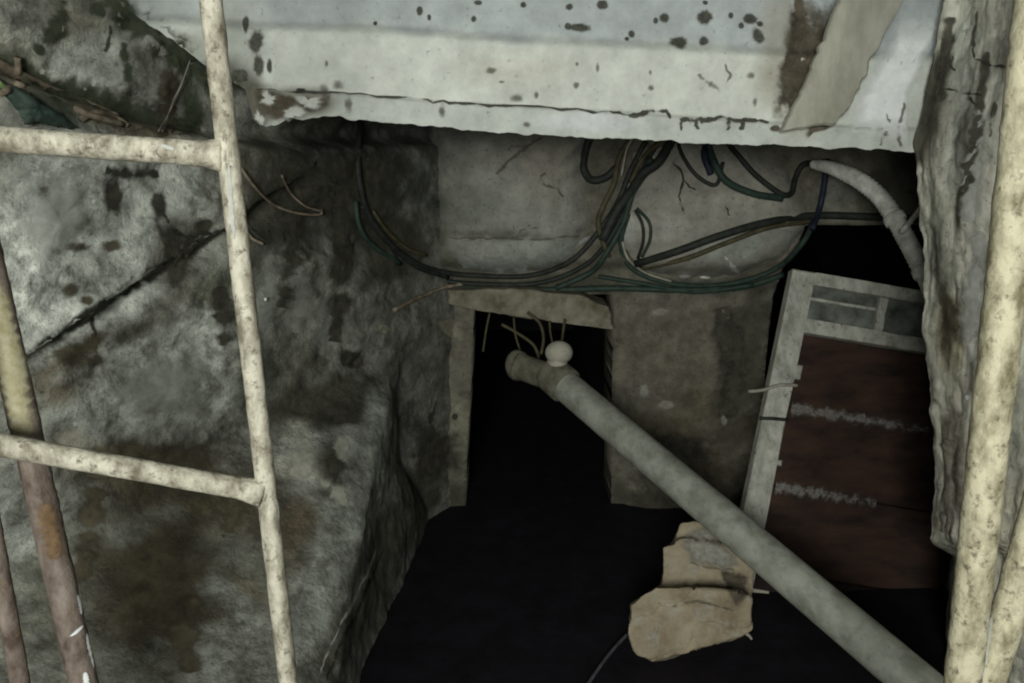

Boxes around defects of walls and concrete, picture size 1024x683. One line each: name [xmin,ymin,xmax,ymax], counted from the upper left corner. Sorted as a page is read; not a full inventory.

spalling [254,88,323,125]
crack [265,83,632,115]
damp [776,0,832,112]
peeling [854,24,935,146]
damp [921,17,956,130]
damp [939,11,997,350]
crack [29,215,224,352]
damp [158,220,212,287]
damp [212,286,236,346]
damp [117,442,211,470]
damp [221,497,243,537]
damp [119,542,209,674]